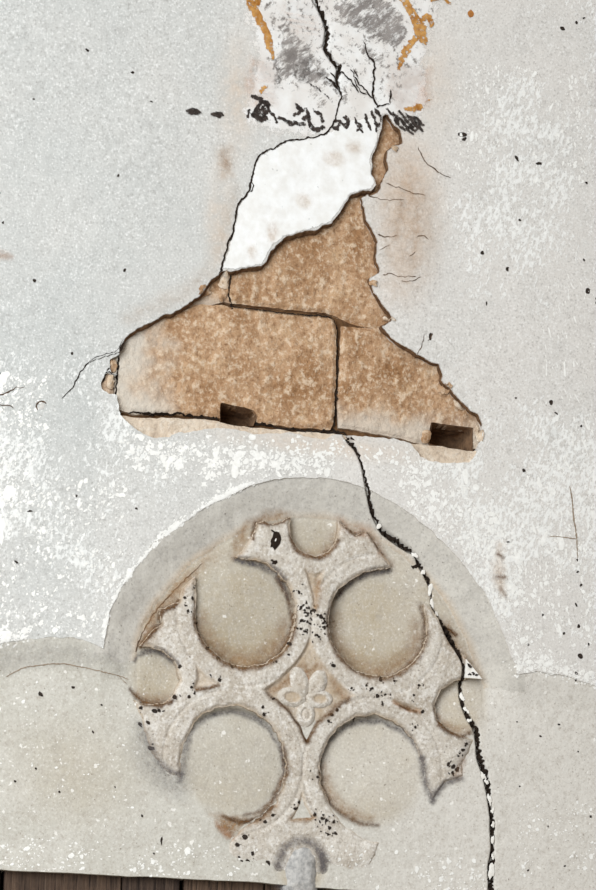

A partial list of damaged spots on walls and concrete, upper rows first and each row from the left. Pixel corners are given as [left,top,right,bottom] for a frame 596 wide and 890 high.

crack [219,0,392,273]
crack [62,340,124,398]
flaking render [0,113,596,689]
crack [331,427,495,890]